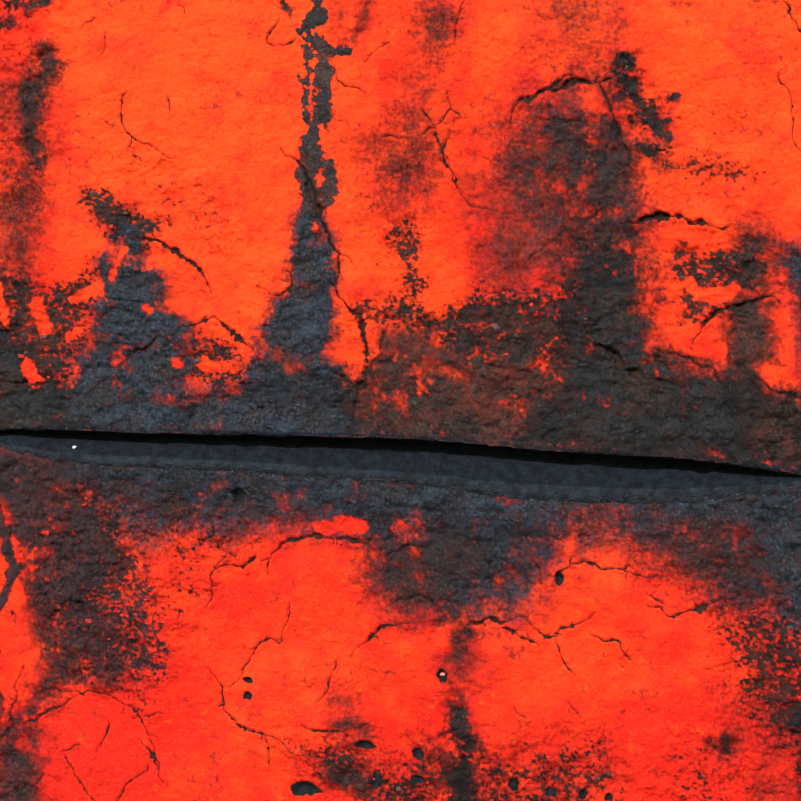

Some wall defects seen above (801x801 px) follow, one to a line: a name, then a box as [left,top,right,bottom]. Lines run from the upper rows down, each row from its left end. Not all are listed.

damp [296,36,314,125]
crack [510,63,631,169]
damp [571,122,642,288]
crack [0,666,165,801]
crack [207,603,292,767]
crack [206,531,429,604]
crack [300,724,366,735]
crack [316,622,413,702]
crack [391,595,458,609]
damp [89,470,774,621]
crack [459,611,630,674]
crack [554,556,739,618]